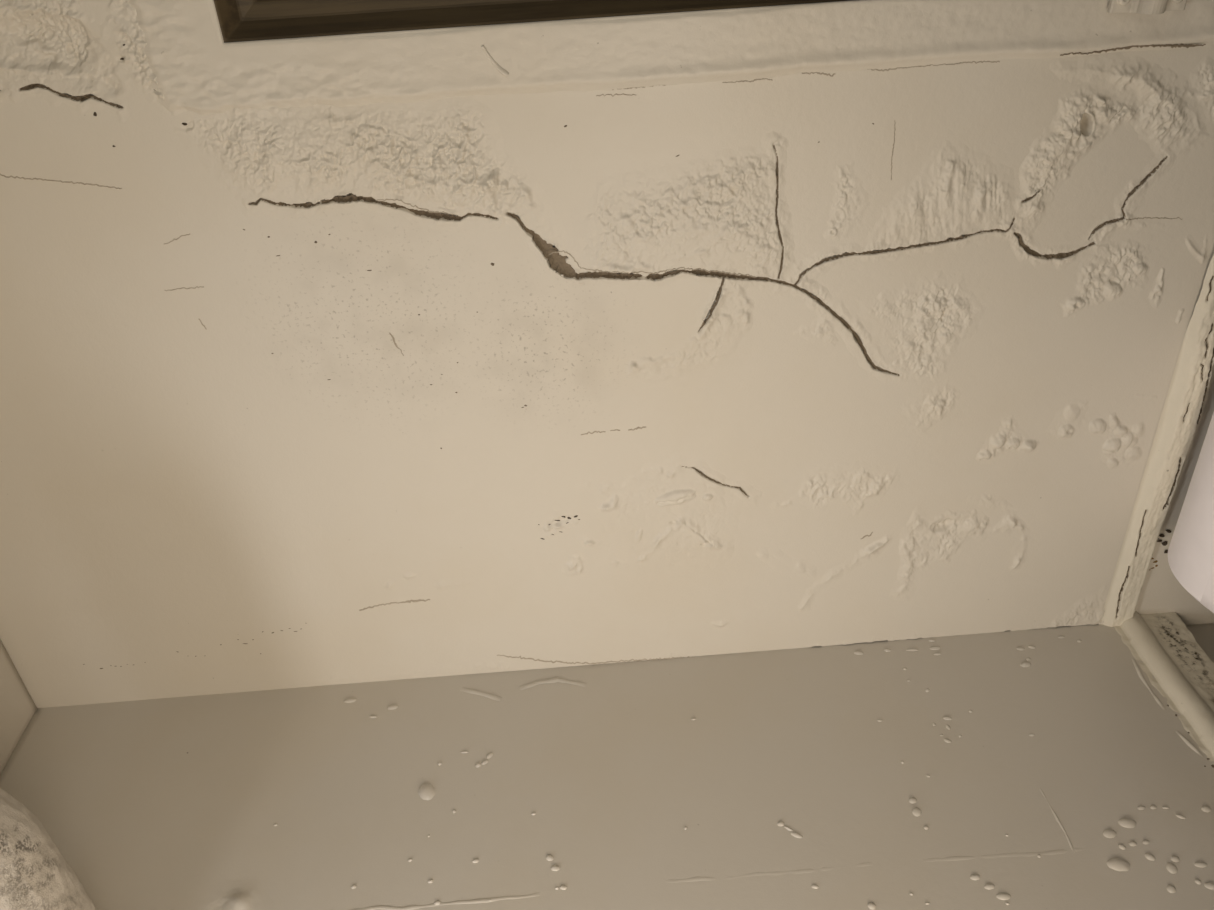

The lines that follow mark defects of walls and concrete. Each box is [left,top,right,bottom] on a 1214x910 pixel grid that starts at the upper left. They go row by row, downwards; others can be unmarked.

crack [0,84,130,124]
crack [889,120,897,180]
crack [235,131,1182,387]
crack [669,453,762,508]